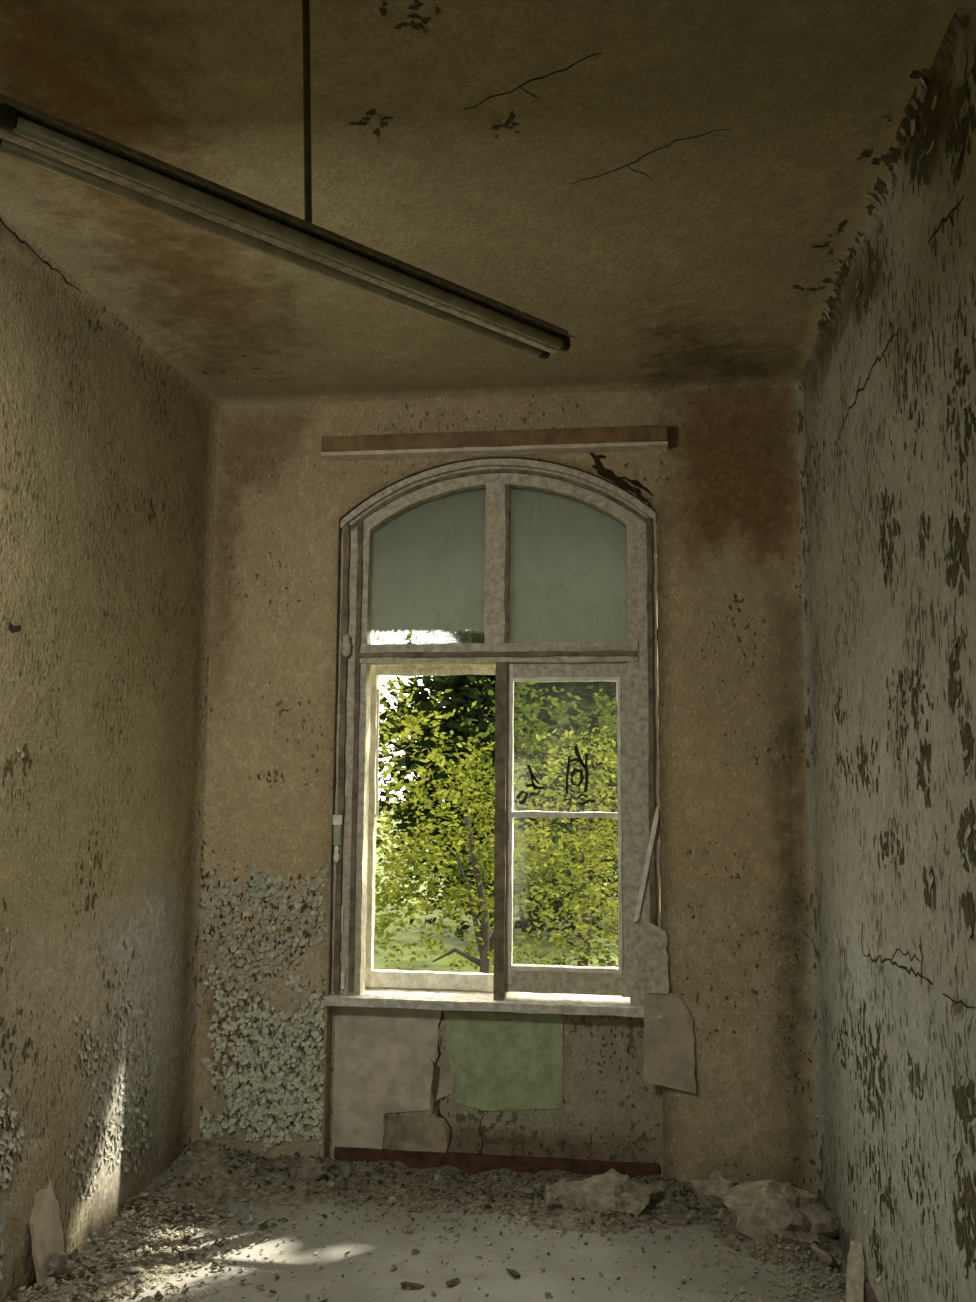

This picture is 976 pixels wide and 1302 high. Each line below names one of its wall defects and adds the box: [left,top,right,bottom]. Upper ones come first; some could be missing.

crack [463,53,601,110]
crack [571,129,731,185]
crack [590,453,654,508]
water stain [679,391,790,544]
peeling [891,306,976,483]
peeling [835,636,973,809]
peeling [956,799,976,940]
peeling [64,941,154,1202]
peeling [199,839,448,1159]
crack [435,1010,443,1064]
peeling [834,998,976,1284]
crack [861,923,976,1008]